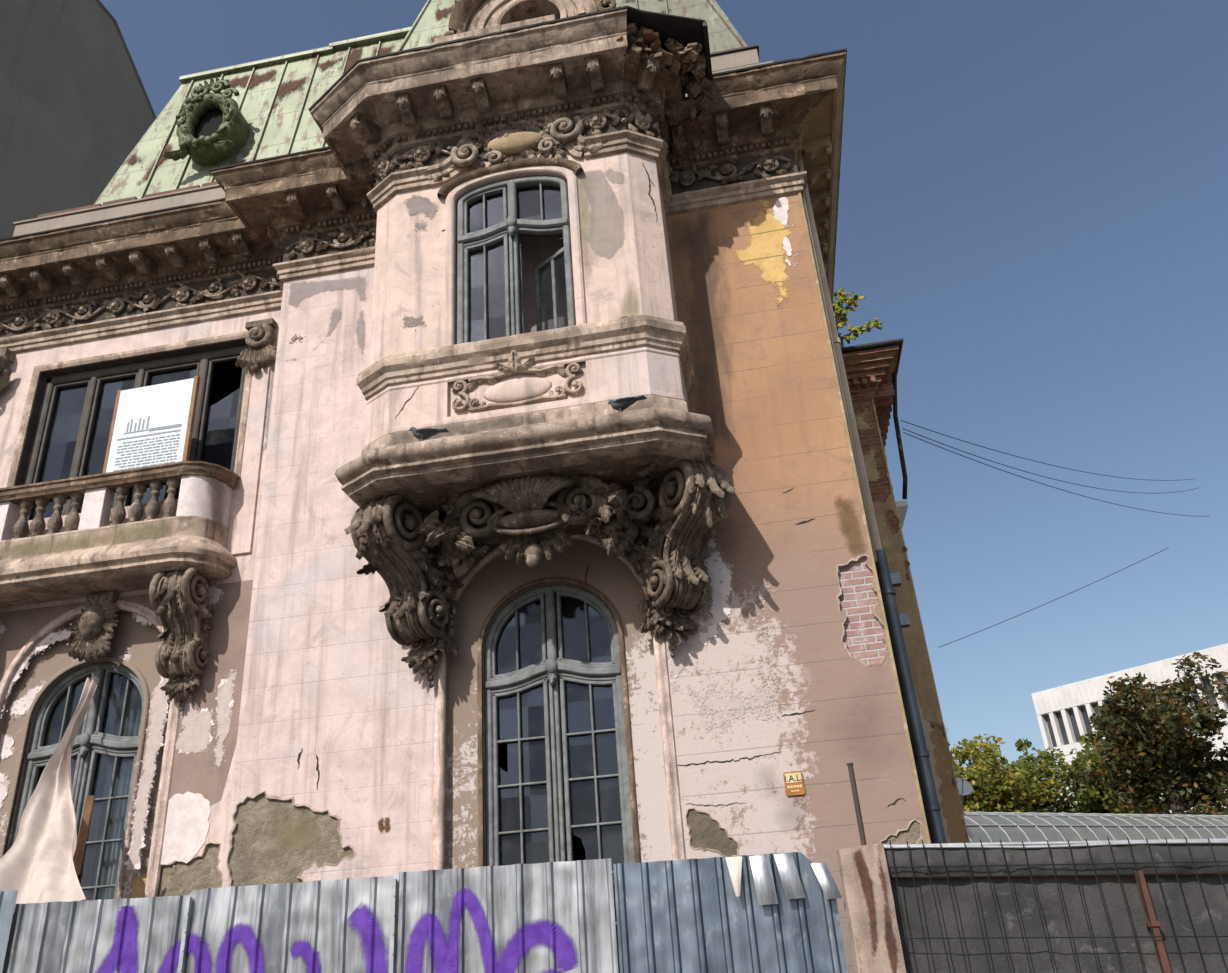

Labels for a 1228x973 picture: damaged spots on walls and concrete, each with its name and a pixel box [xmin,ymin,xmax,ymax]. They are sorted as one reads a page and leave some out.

crack [642,163,658,222]
peeling [735,197,798,306]
spalling [852,399,911,582]
spalling [836,554,888,667]
peeling [0,602,86,813]
spalling [119,580,357,898]
crack [678,752,780,767]
peeling [917,699,971,843]
spalling [685,807,740,857]
spalling [880,819,923,844]
rust [853,850,897,973]